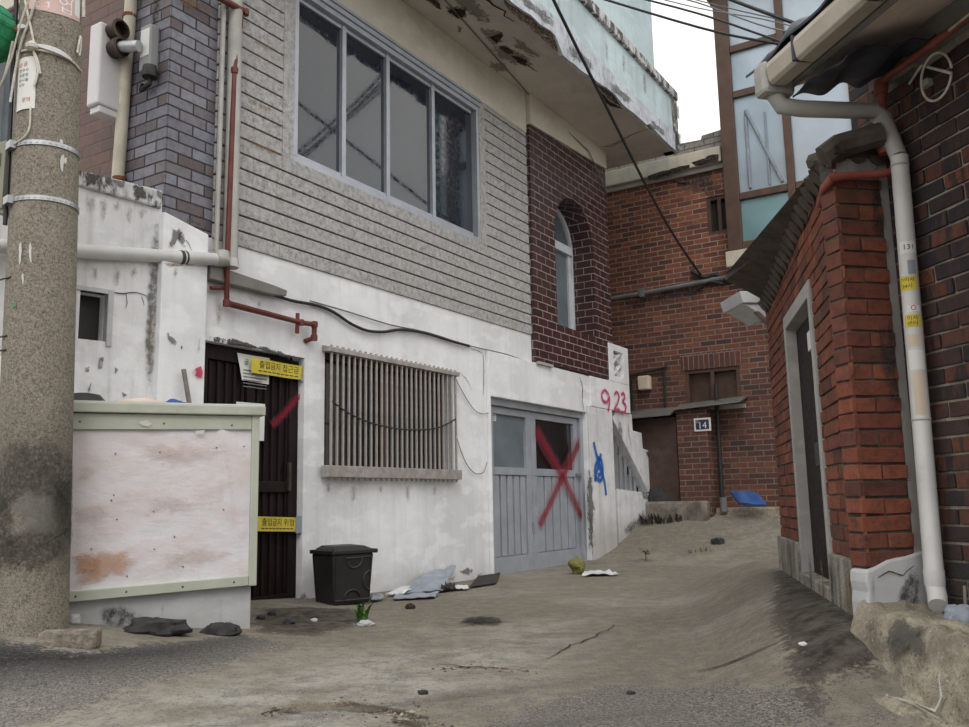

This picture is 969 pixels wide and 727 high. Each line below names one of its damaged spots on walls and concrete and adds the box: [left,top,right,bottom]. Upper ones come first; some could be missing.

peeling [426,0,539,72]
spalling [504,0,558,51]
spalling [597,85,630,109]
peeling [647,121,681,147]
leakage [146,262,158,374]
rust [76,554,126,583]
crack [432,624,614,674]
crack [699,642,777,671]